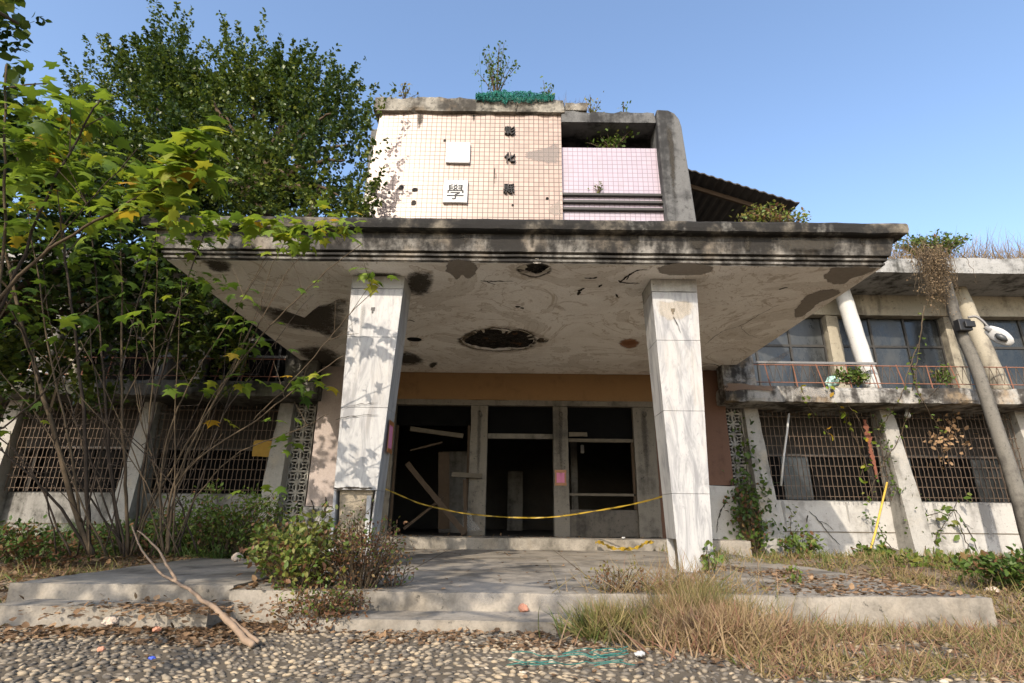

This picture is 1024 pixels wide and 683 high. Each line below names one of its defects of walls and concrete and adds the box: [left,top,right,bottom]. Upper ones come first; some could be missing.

leakage [203,259,230,272]
leakage [446,259,478,279]
spalling [517,262,551,278]
leakage [658,263,713,275]
leakage [374,272,432,295]
crack [577,269,644,298]
leakage [794,266,876,317]
leakage [256,300,345,370]
spalling [458,327,549,351]
corrosion [619,339,639,348]